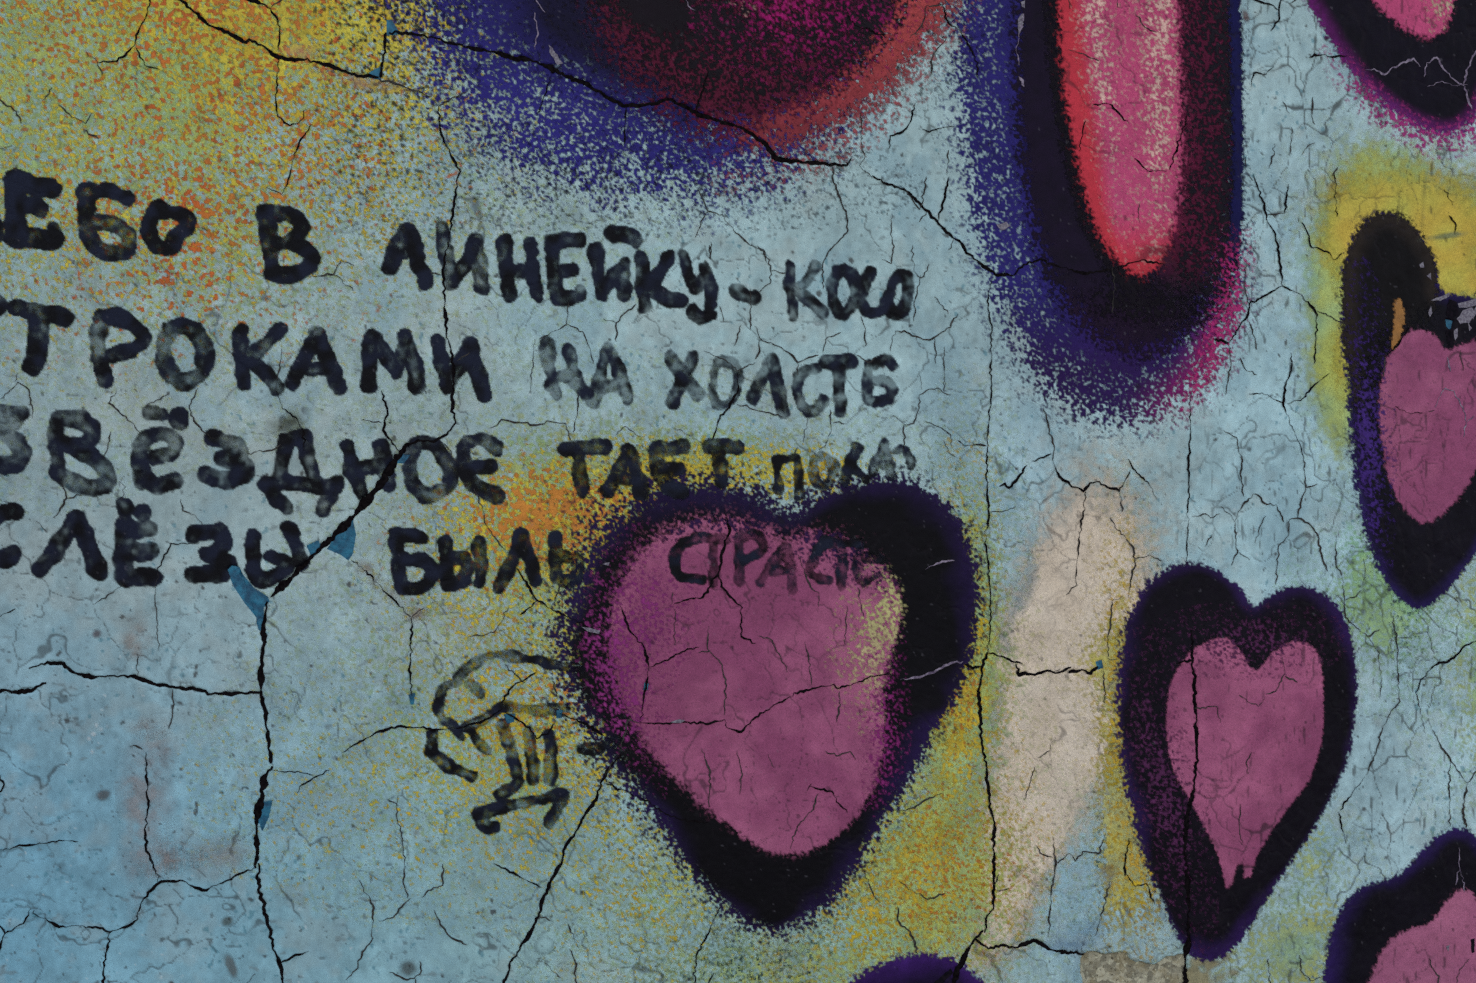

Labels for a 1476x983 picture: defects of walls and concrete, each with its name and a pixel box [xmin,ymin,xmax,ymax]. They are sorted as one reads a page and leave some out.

peeling [228,566,270,631]
peeling [307,521,356,561]
crack [0,0,1165,983]
crack [1177,630,1297,983]